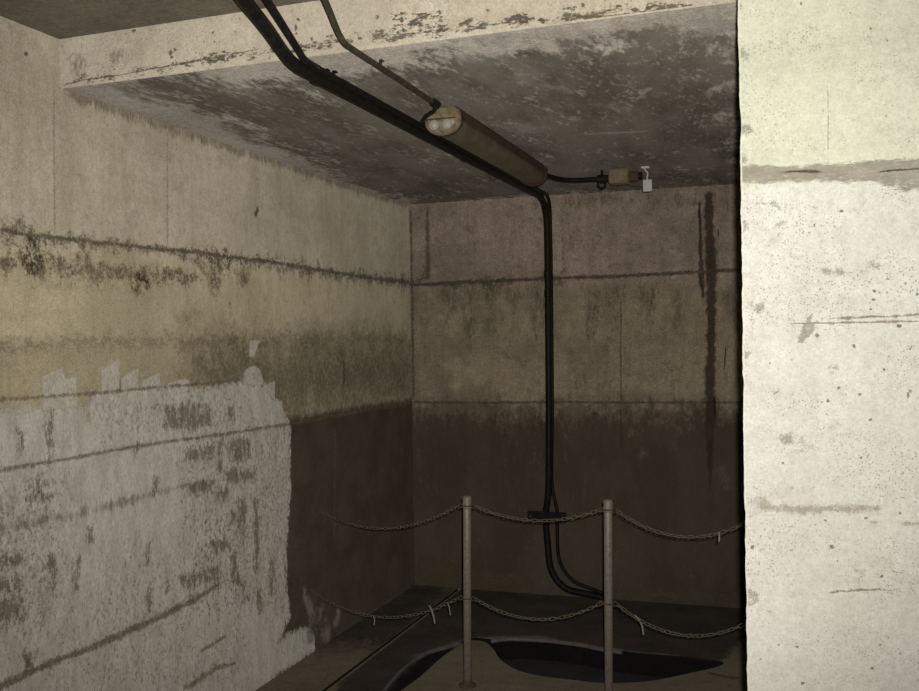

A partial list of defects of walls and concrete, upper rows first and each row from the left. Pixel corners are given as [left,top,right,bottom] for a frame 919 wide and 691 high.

spalling [66,48,275,85]
leakage [117,72,530,204]
spalling [290,3,693,53]
leakage [343,24,919,195]
leakage [0,219,427,296]
leakage [143,193,747,691]
peeling [0,340,315,691]